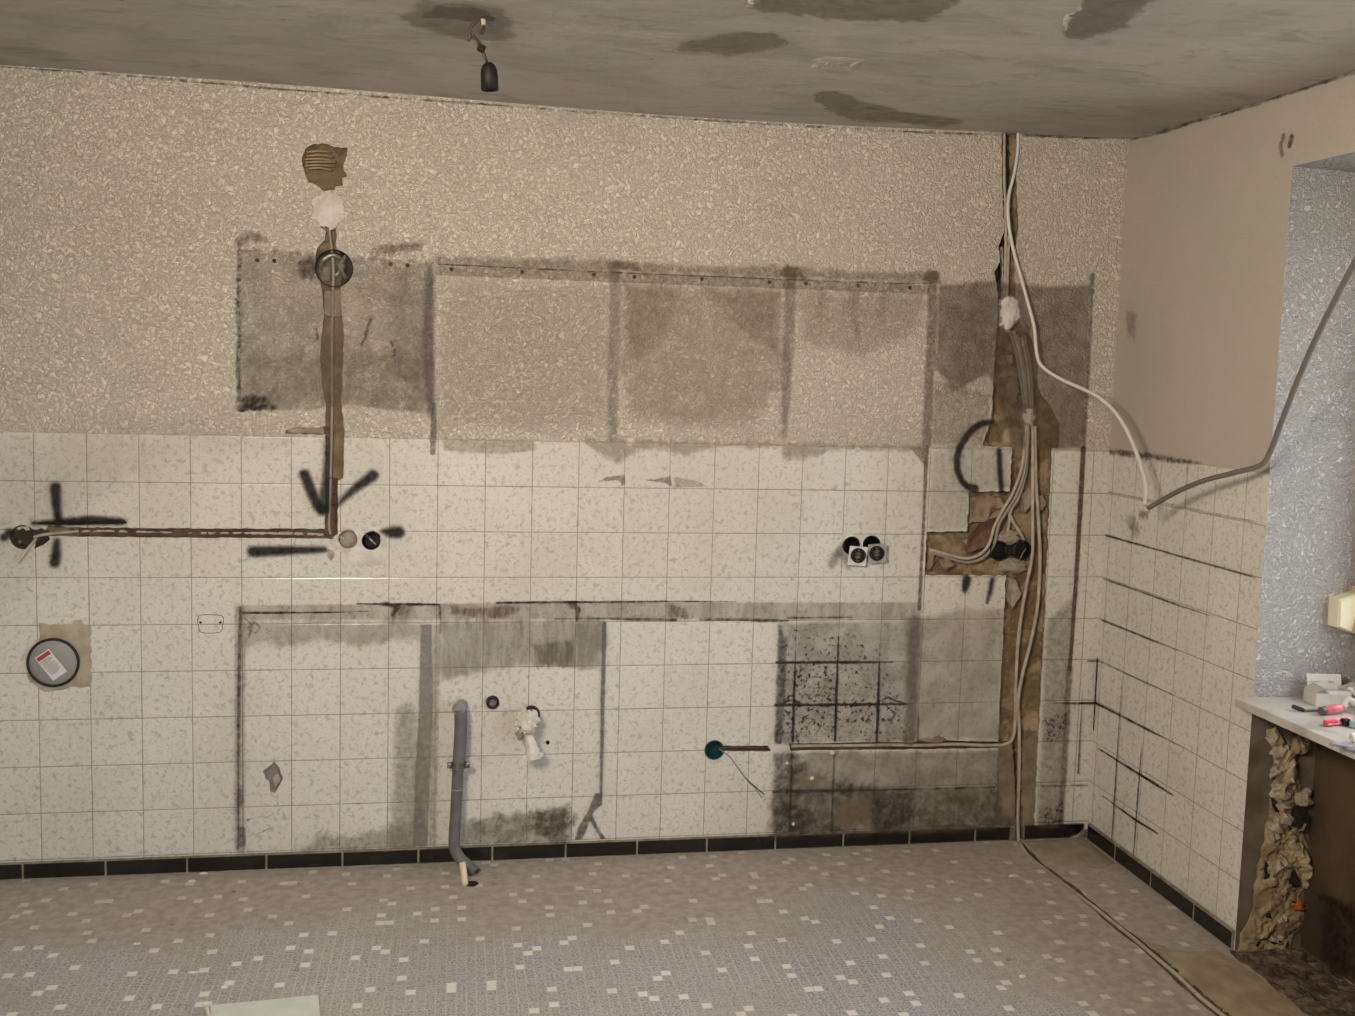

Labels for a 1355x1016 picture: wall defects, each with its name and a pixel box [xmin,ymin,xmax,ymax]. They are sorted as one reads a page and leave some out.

leakage [774,628,919,744]